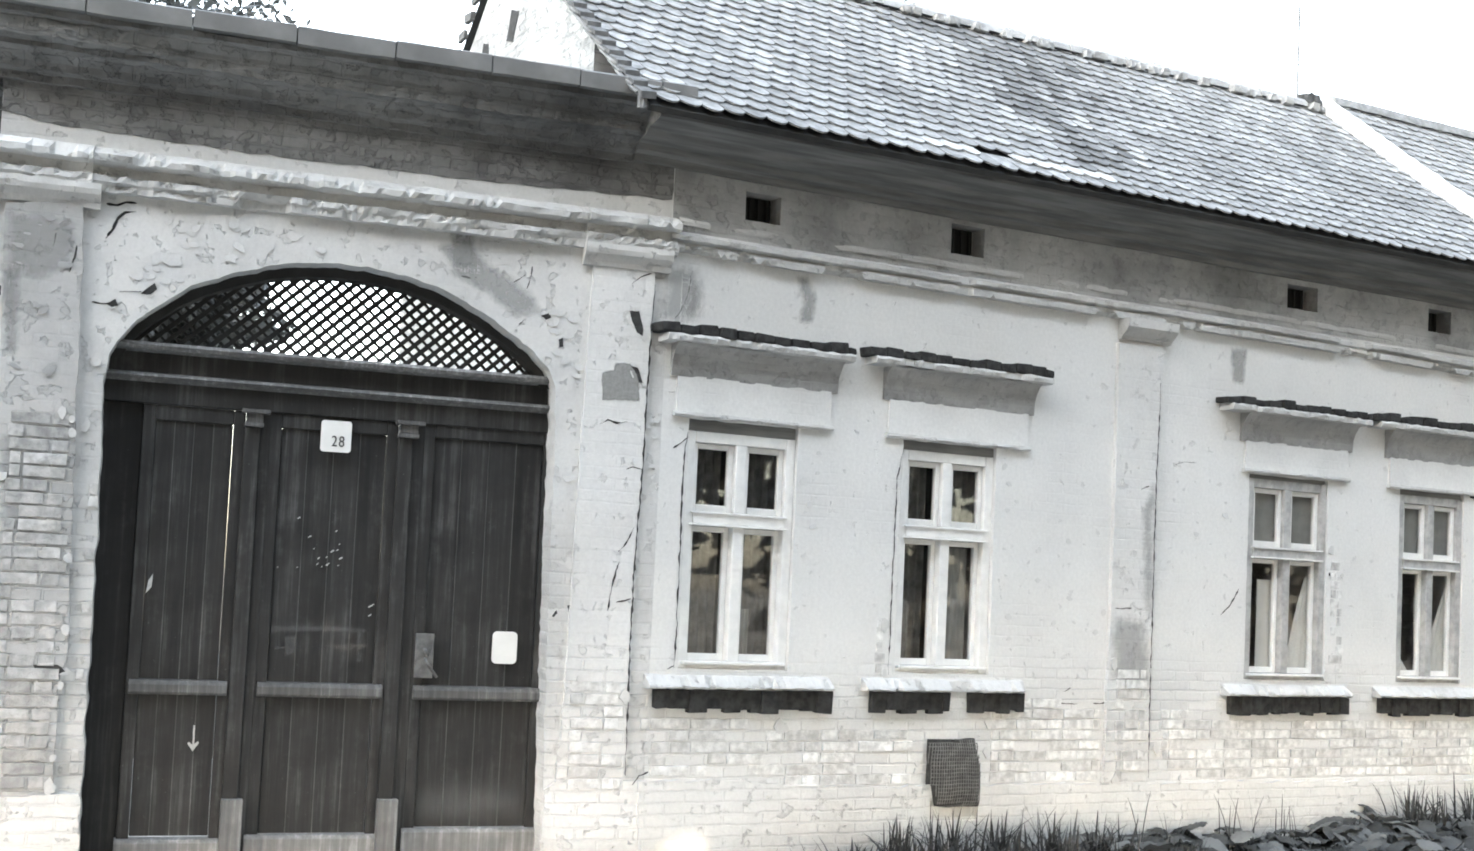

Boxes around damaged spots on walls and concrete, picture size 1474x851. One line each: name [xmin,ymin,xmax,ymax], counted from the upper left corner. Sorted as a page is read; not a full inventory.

peeling [131,219,200,297]
peeling [88,483,99,508]
peeling [0,393,95,795]